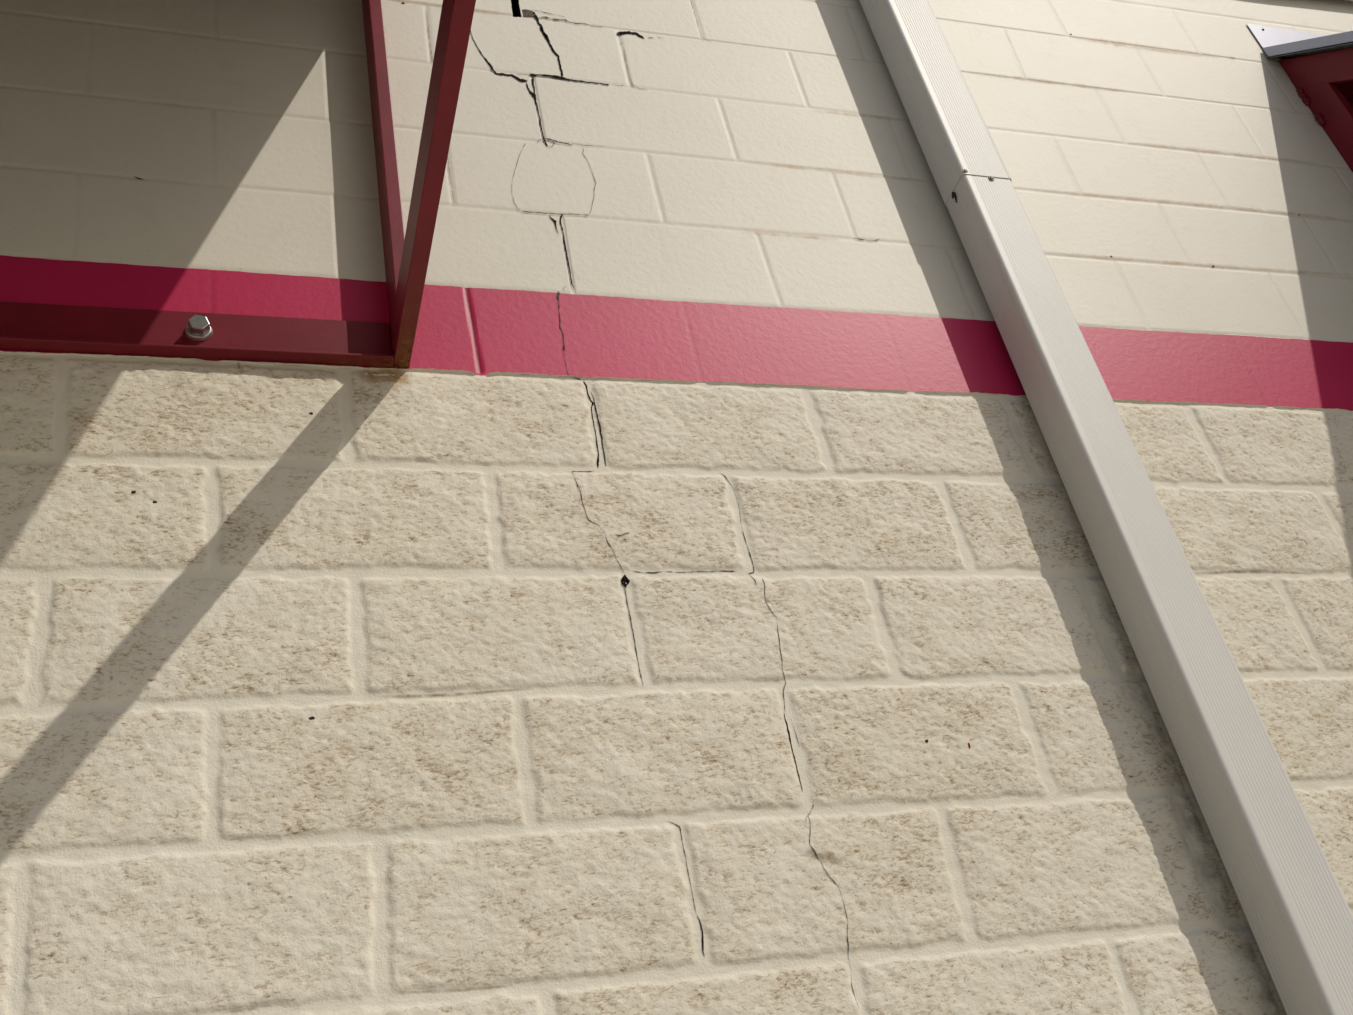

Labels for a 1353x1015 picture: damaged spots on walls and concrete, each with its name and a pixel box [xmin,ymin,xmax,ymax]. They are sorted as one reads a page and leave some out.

crack [470,11,858,1005]